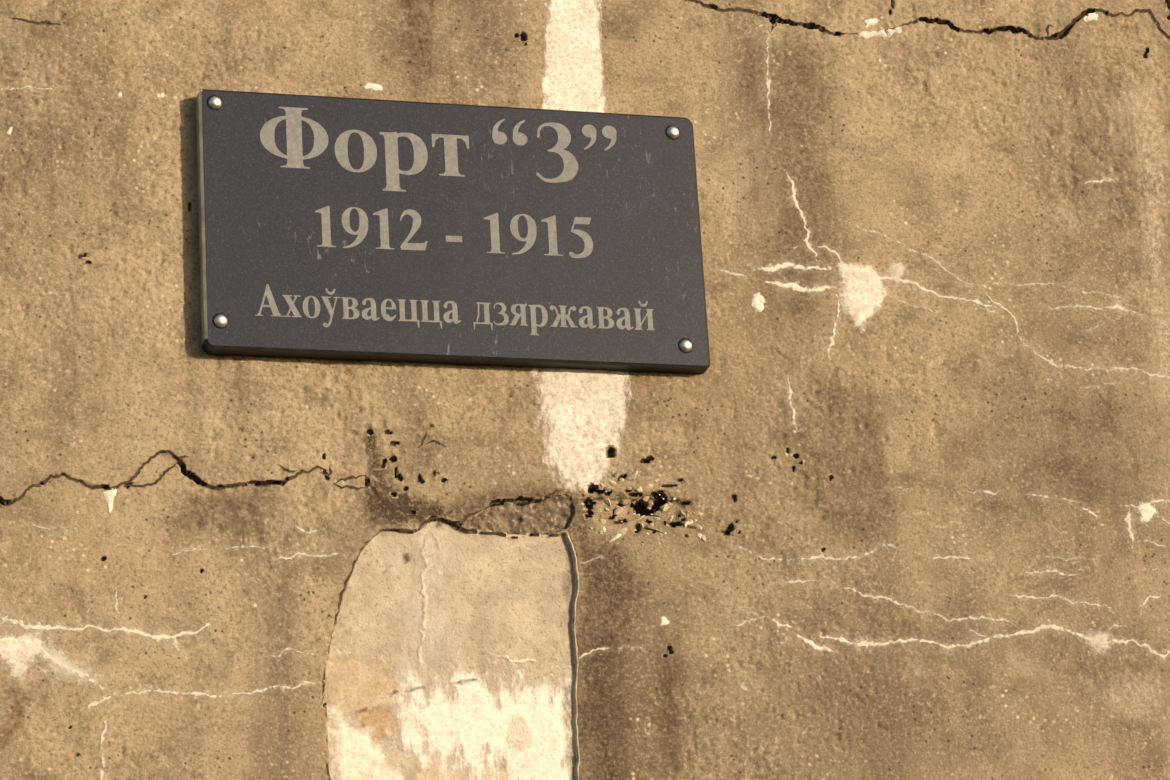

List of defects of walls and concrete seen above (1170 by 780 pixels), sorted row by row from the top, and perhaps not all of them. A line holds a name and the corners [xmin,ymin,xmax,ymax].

crack [690,0,1170,41]
efflorescence [839,263,903,330]
spalling [470,448,706,546]
crack [0,450,565,780]